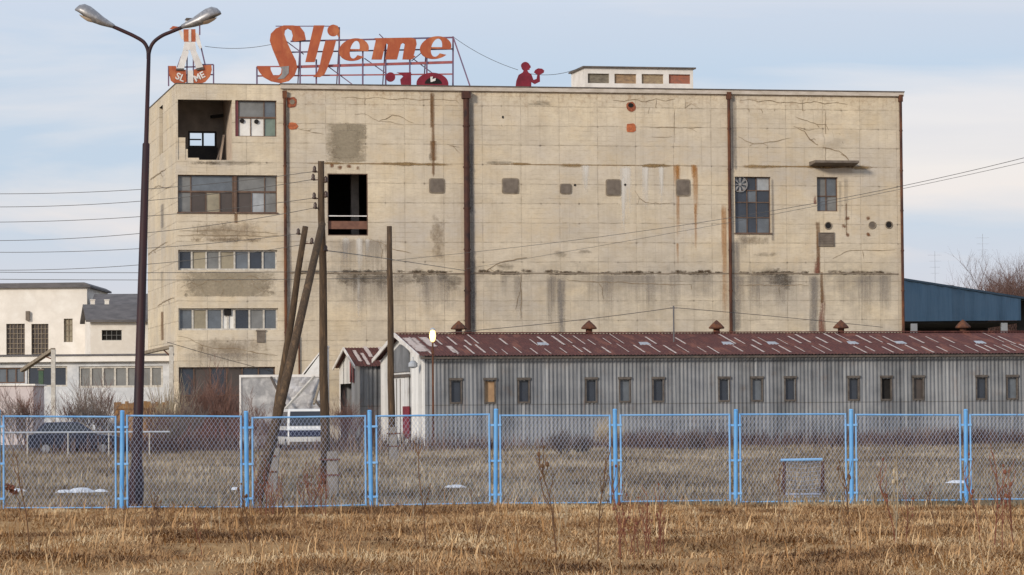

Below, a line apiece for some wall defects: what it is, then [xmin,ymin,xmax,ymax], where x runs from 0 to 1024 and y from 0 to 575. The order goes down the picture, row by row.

corrosion [326,95,445,175]
crack [341,97,453,125]
crack [740,99,849,160]
water stain [409,270,719,354]
corrosion [813,226,825,331]